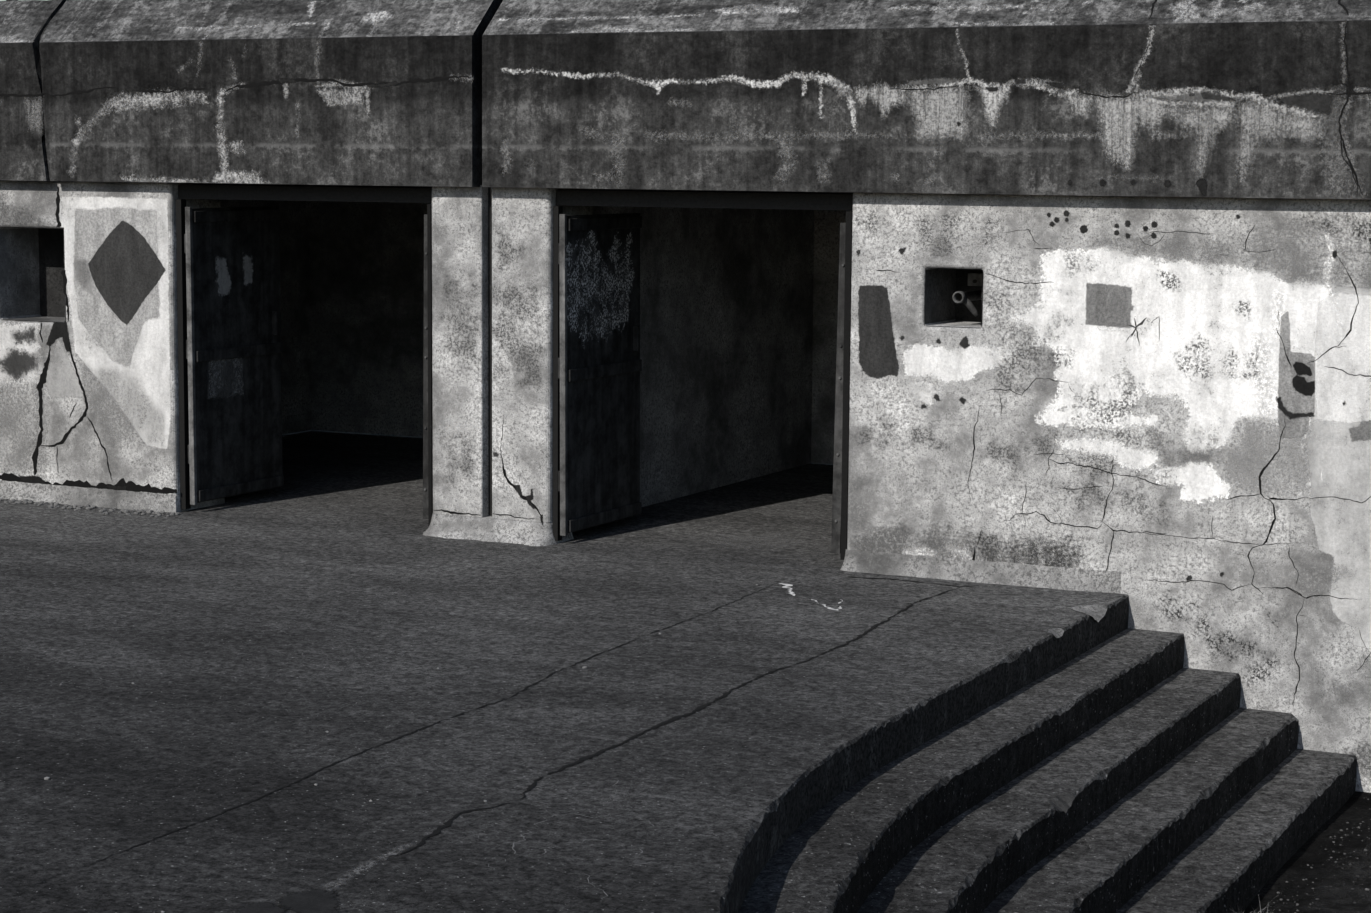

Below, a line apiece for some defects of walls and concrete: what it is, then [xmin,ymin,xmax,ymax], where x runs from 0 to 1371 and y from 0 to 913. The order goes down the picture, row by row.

damp [504,68,603,79]
damp [629,77,678,91]
damp [696,73,966,155]
damp [981,86,1010,139]
crack [1126,0,1157,93]
damp [1047,92,1315,163]
crack [1321,0,1371,199]
crack [53,181,61,227]
crack [32,270,113,482]
peeling [1009,210,1336,505]
crack [1276,252,1371,377]
crack [32,378,1371,913]